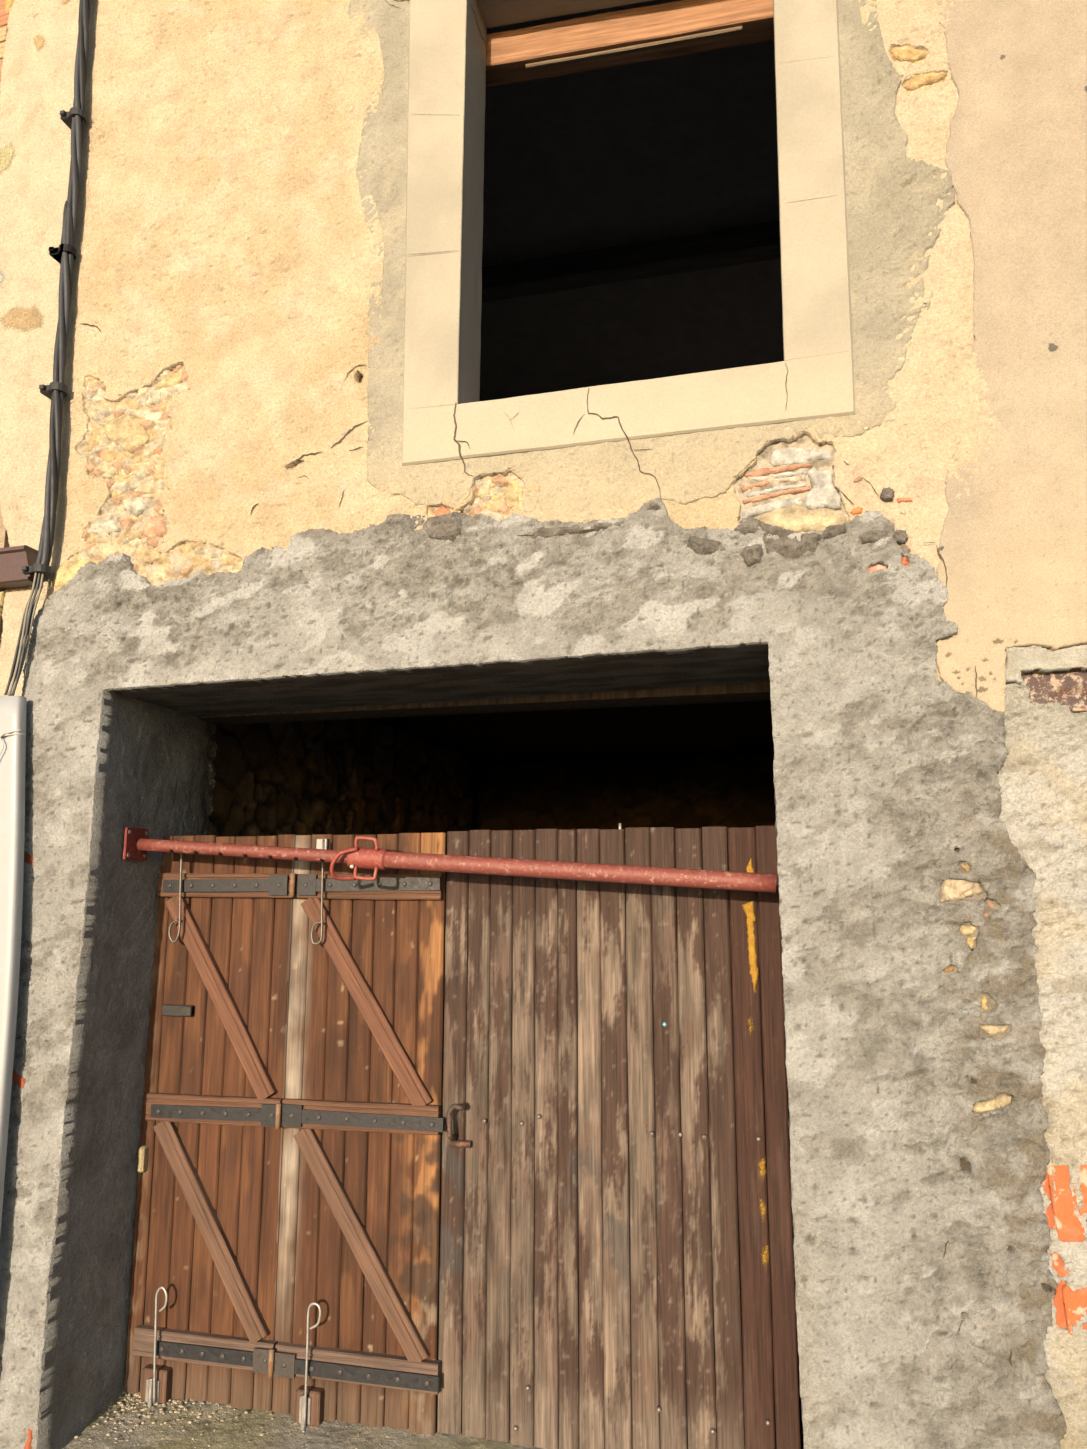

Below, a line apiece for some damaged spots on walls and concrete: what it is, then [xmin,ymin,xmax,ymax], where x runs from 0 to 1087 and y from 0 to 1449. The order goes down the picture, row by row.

spalling [889,44,947,97]
spalling [50,364,243,590]
crack [453,403,473,476]
crack [573,388,661,498]
spalling [734,434,863,534]
peeling [1041,1165,1087,1335]